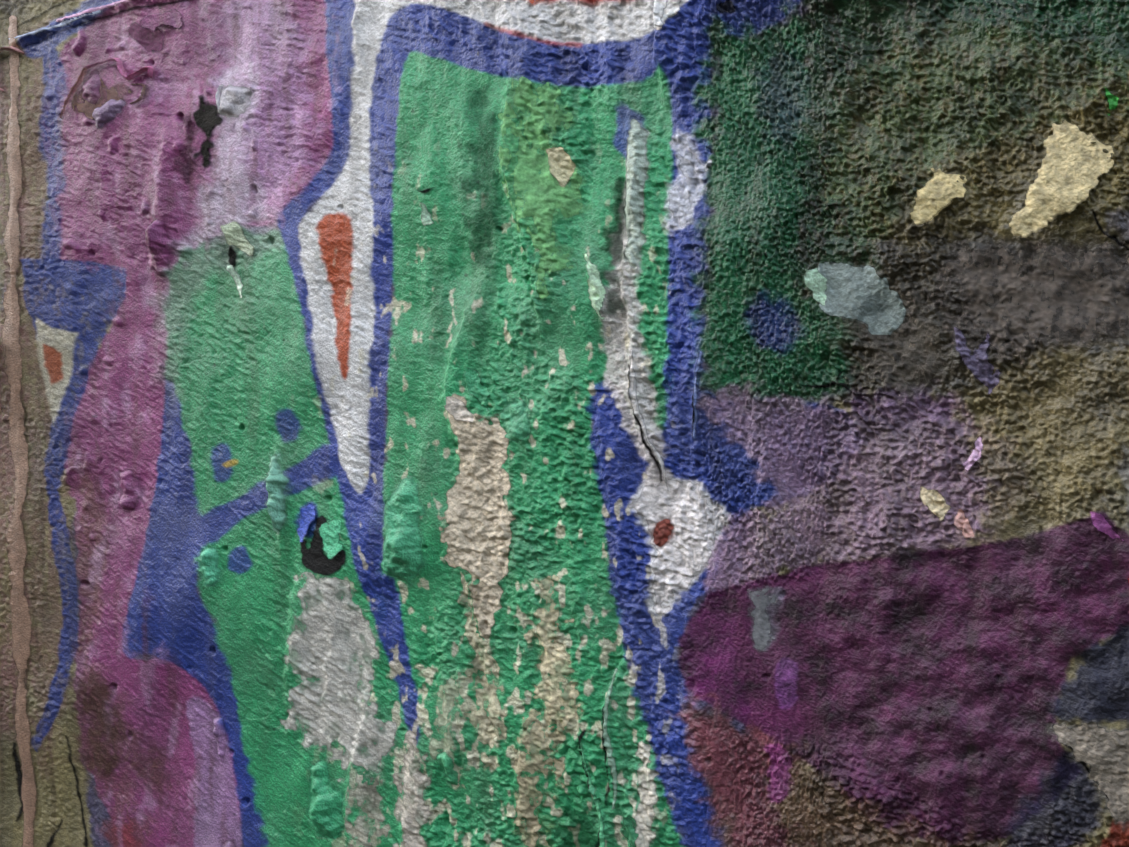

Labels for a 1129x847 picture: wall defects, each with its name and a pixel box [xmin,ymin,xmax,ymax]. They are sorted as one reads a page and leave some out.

crack [0,0,187,60]
peeling [128,9,183,52]
peeling [59,58,154,129]
peeling [804,120,1129,397]
peeling [1090,512,1124,541]
spalling [1053,722,1129,822]